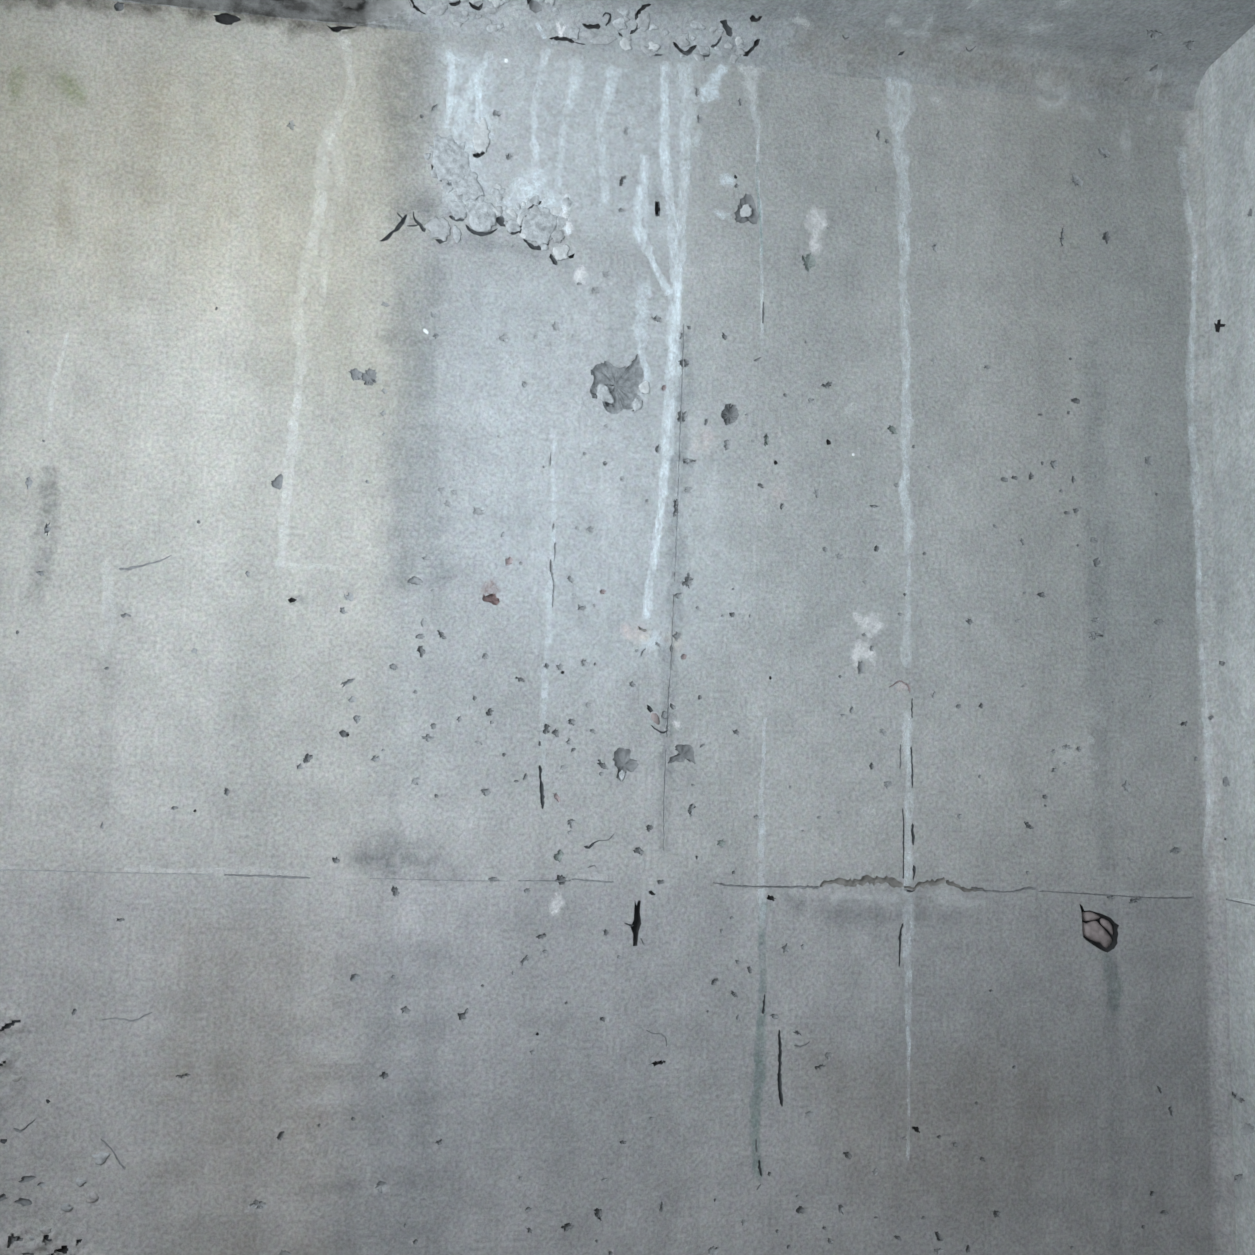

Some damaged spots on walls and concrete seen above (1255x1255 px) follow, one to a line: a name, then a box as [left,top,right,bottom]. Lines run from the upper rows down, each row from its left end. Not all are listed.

damp [380,117,582,278]
spalling [723,175,759,224]
spalling [590,354,666,428]
crack [712,699,1195,899]
crack [0,870,311,879]
crack [369,833,615,883]
crack [1226,898,1255,906]
crack [896,923,904,967]
spalling [1082,911,1113,948]
crack [777,1030,810,1107]